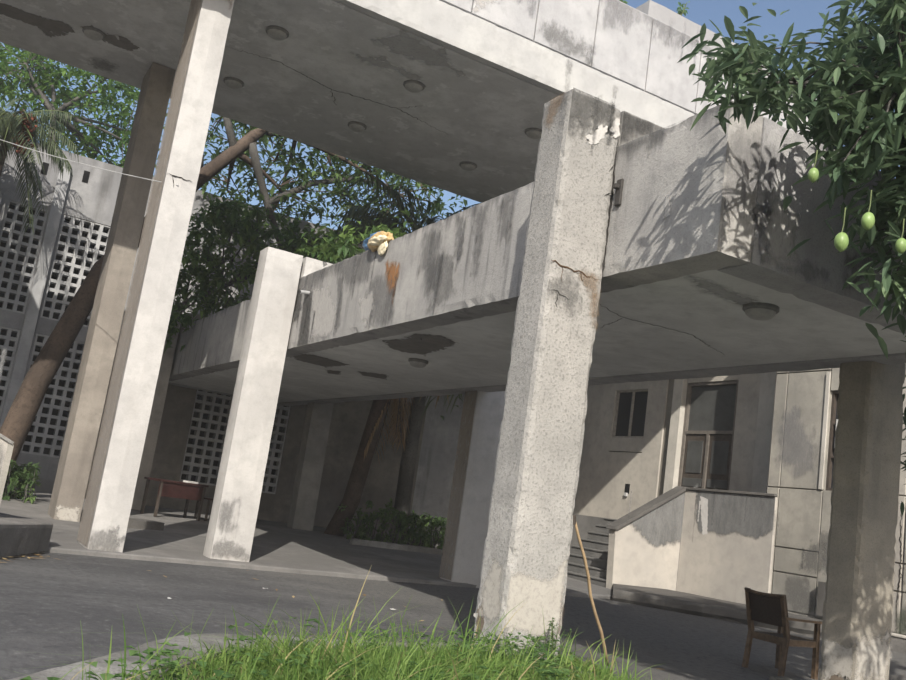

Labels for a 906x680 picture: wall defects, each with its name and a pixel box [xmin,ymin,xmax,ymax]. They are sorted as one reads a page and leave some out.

peeling [0,3,140,51]
spalling [586,118,620,145]
leakage [565,87,653,143]
crack [551,143,724,355]
leakage [294,250,392,346]
rust [385,261,399,290]
peeling [382,334,455,357]
leakage [631,487,775,547]
leakage [897,611,906,632]